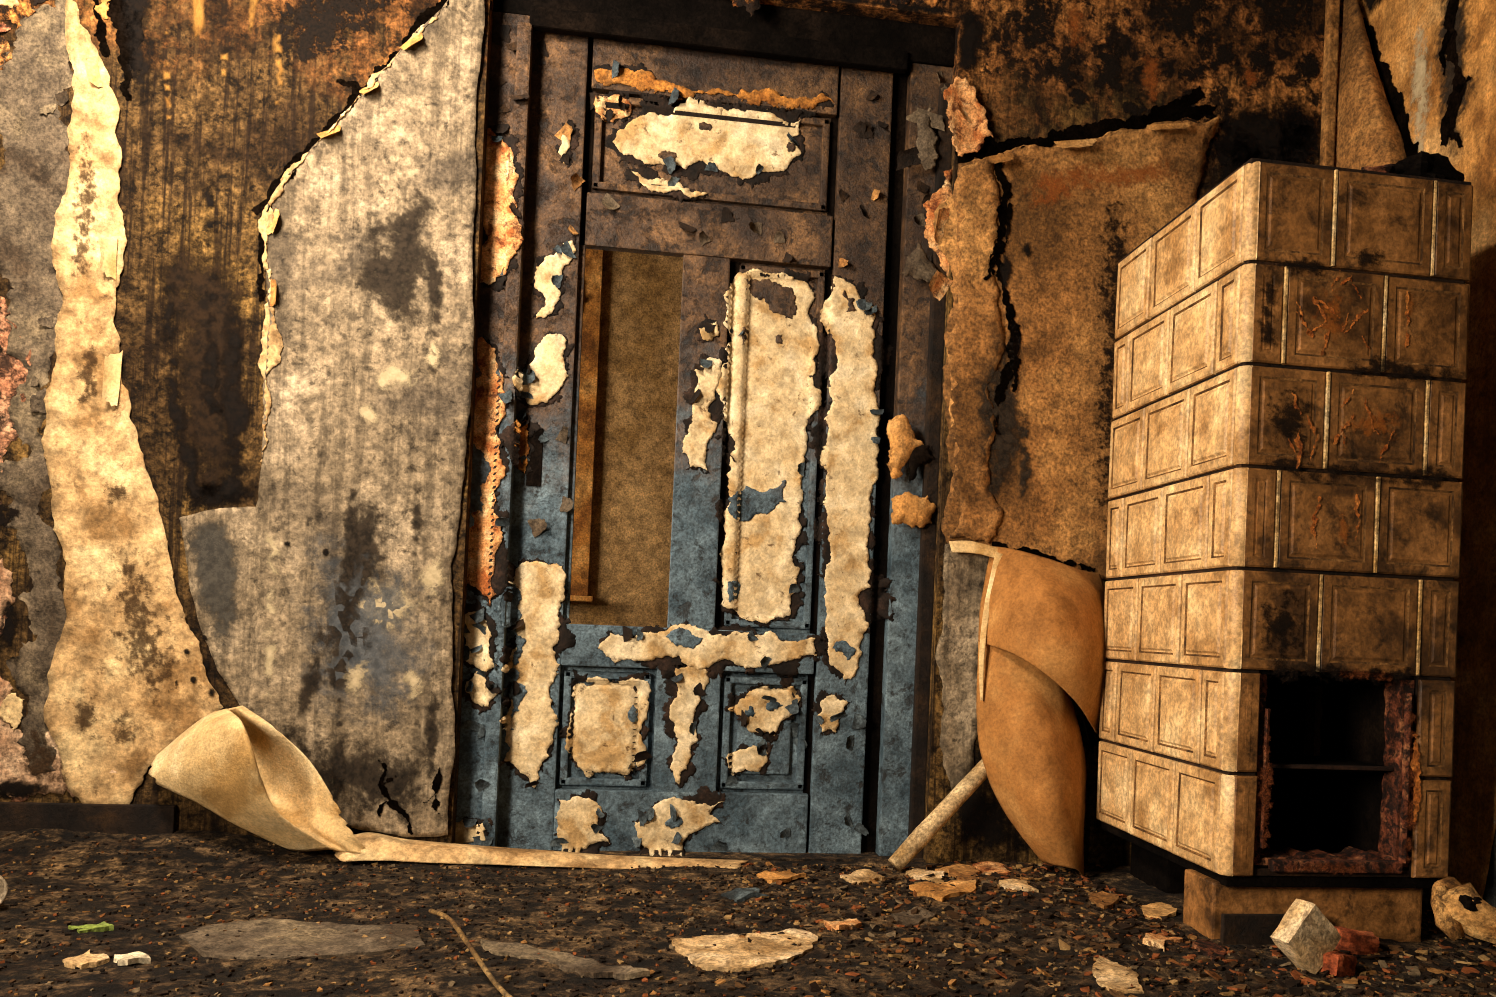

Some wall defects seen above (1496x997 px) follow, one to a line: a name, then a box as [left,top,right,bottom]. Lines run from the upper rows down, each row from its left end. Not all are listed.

water stain [193,0,203,31]
water stain [273,0,394,72]
water stain [1000,0,1151,118]
water stain [1131,0,1320,84]
peeling [481,128,524,285]
peeling [554,60,833,198]
peeling [839,189,880,218]
peeling [896,71,993,301]
crack [955,85,1217,435]
flaking render [0,0,80,802]
peeling [455,222,937,856]
water stain [1,601,18,647]